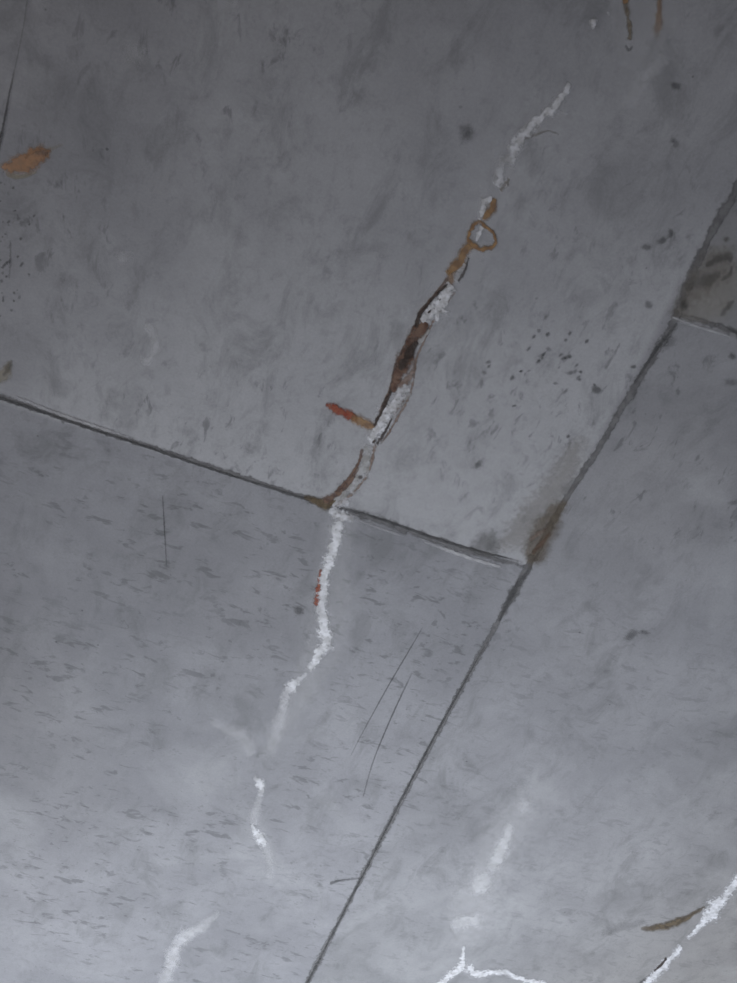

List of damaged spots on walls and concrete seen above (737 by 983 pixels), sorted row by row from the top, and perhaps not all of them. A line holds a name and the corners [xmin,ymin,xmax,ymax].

crack [623,0,632,40]
crack [284,83,571,697]
corrosion [326,403,376,430]
crack [640,874,737,983]
crack [436,946,546,983]